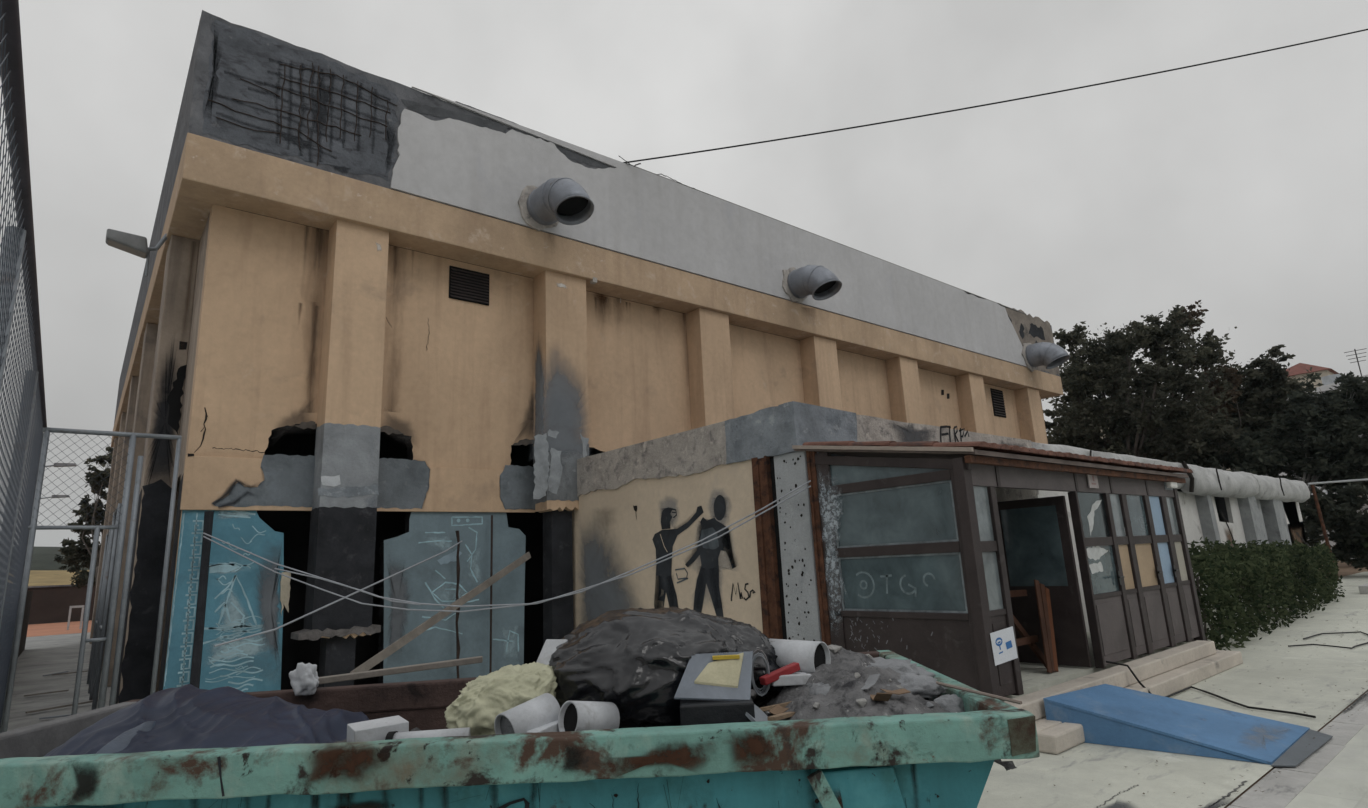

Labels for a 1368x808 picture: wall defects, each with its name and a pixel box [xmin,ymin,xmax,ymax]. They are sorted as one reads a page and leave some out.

spalling [202,20,614,181]
crack [188,407,264,457]
peeling [294,421,403,509]